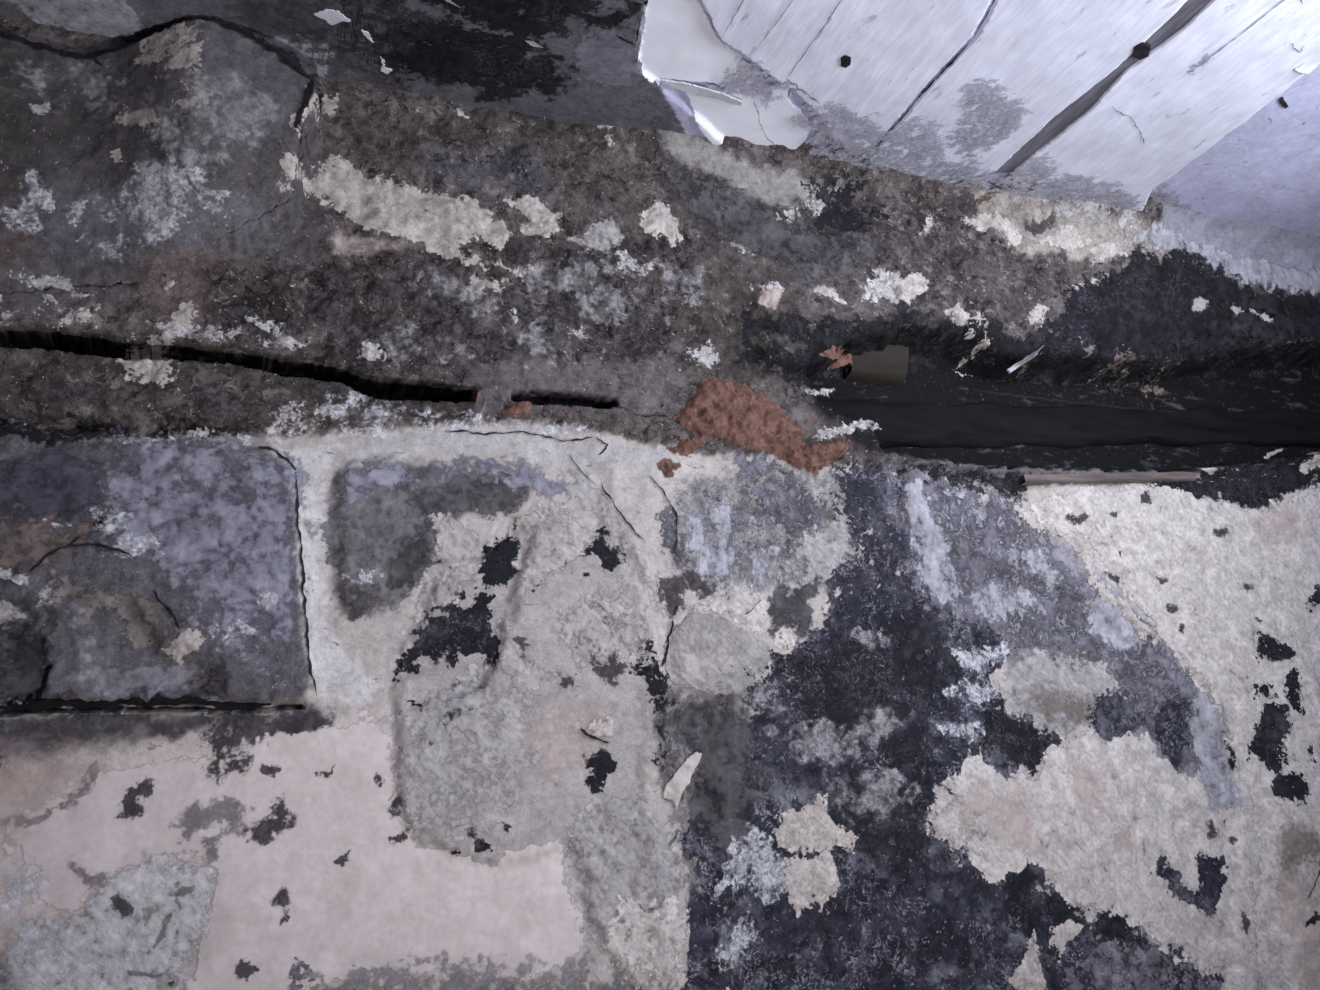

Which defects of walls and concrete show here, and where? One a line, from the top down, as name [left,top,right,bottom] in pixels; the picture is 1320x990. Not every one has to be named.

crack [0,16,323,132]
water stain [997,280,1111,384]
water stain [1192,296,1209,312]
water stain [813,420,878,441]
crack [971,389,1173,412]
crack [258,446,317,695]
water stain [330,455,567,728]
flaking render [412,512,486,625]
crack [0,696,271,712]
water stain [559,445,1238,990]
water stain [374,772,410,843]
water stain [451,827,493,857]